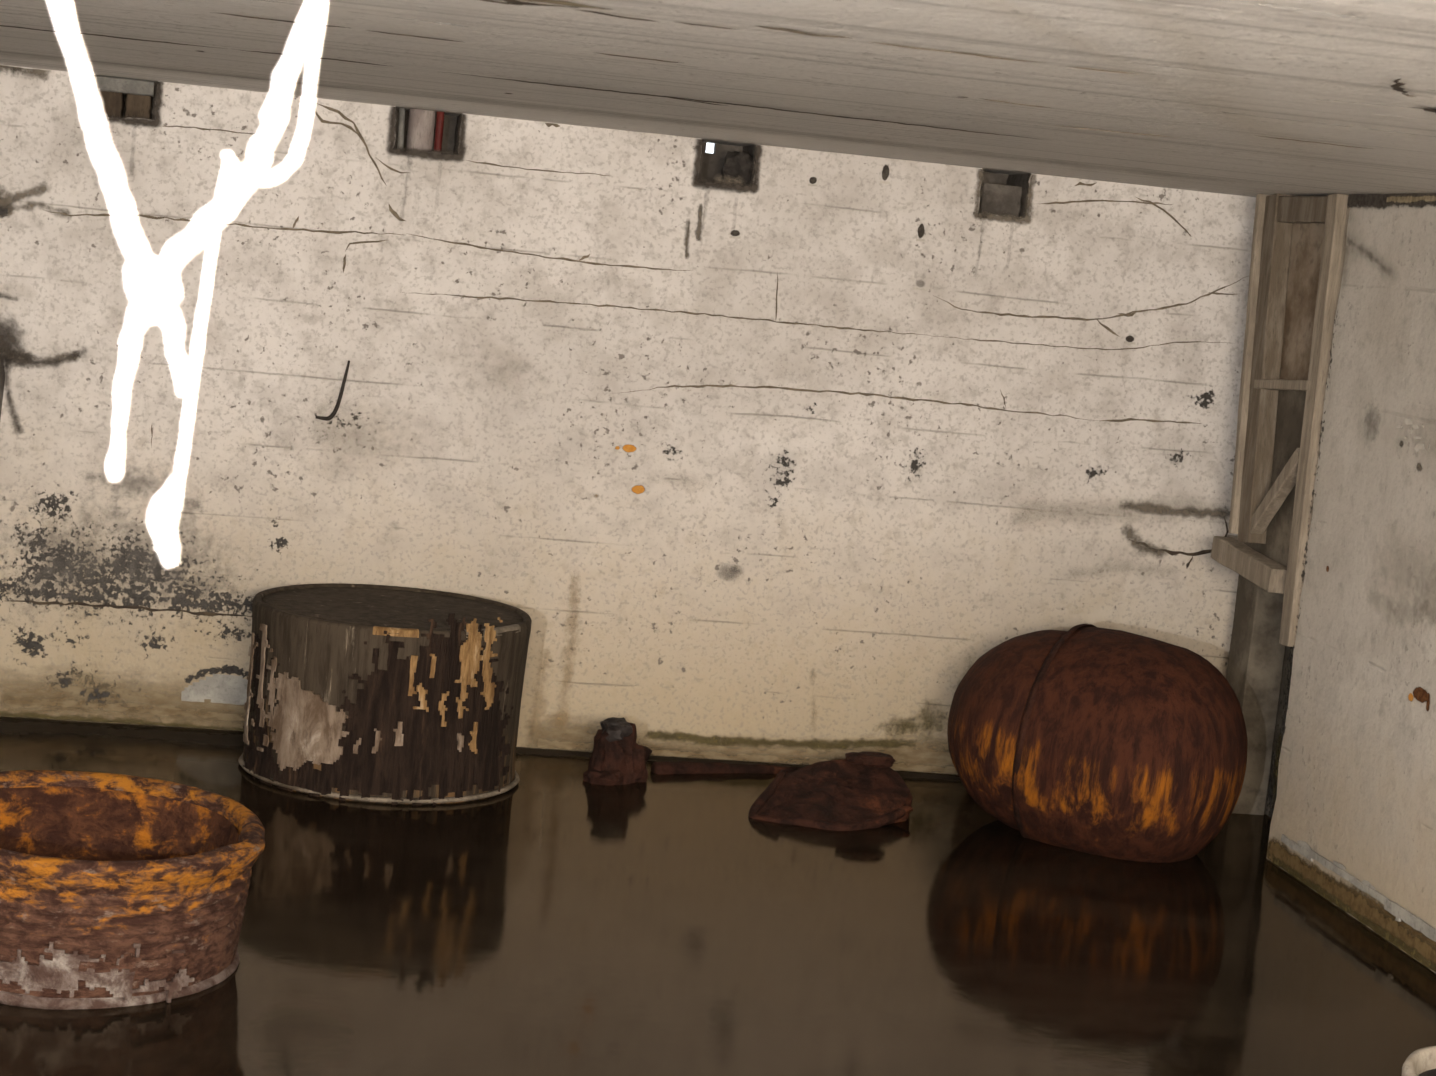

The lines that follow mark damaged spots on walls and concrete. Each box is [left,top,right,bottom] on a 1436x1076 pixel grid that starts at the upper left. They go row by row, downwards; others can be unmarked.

crack [480,0,1136,74]
leakage [0,65,49,80]
crack [45,102,690,273]
crack [1041,182,1191,237]
crack [403,274,1248,350]
crack [623,384,1201,424]
leakage [1124,503,1230,518]
leakage [1125,527,1165,557]
leakage [0,484,254,731]
rust [1408,687,1430,711]
leakage [531,723,602,752]
leakage [636,709,957,774]